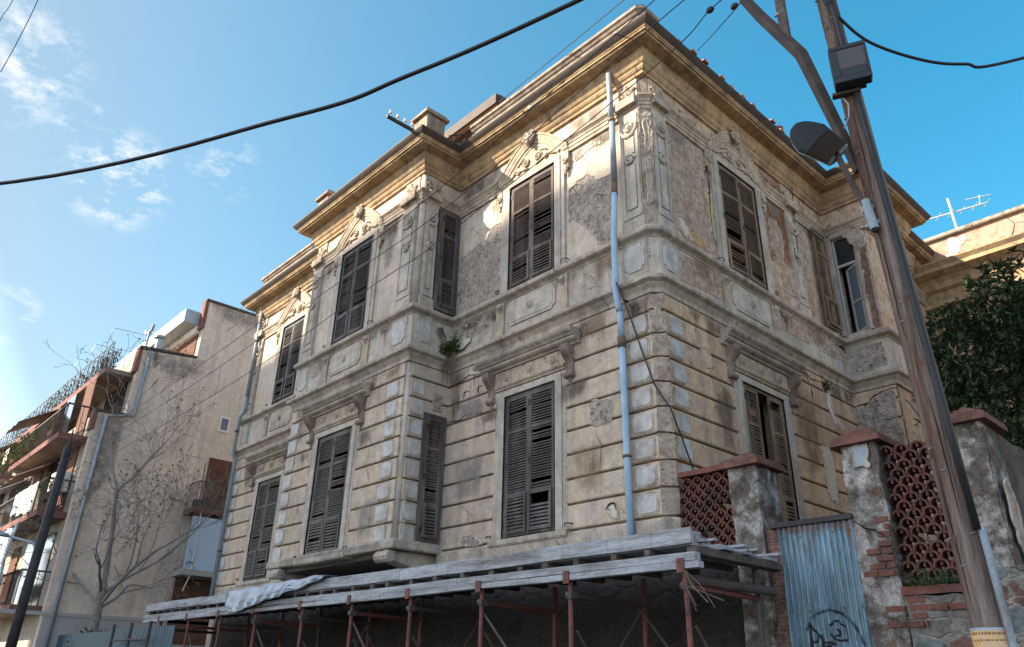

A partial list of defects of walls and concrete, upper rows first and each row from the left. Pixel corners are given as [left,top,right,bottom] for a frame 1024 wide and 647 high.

peeling [575,136,601,161]
flaking render [567,173,612,245]
flaking render [668,125,717,256]
flaking render [456,221,502,352]
flaking render [855,389,906,452]